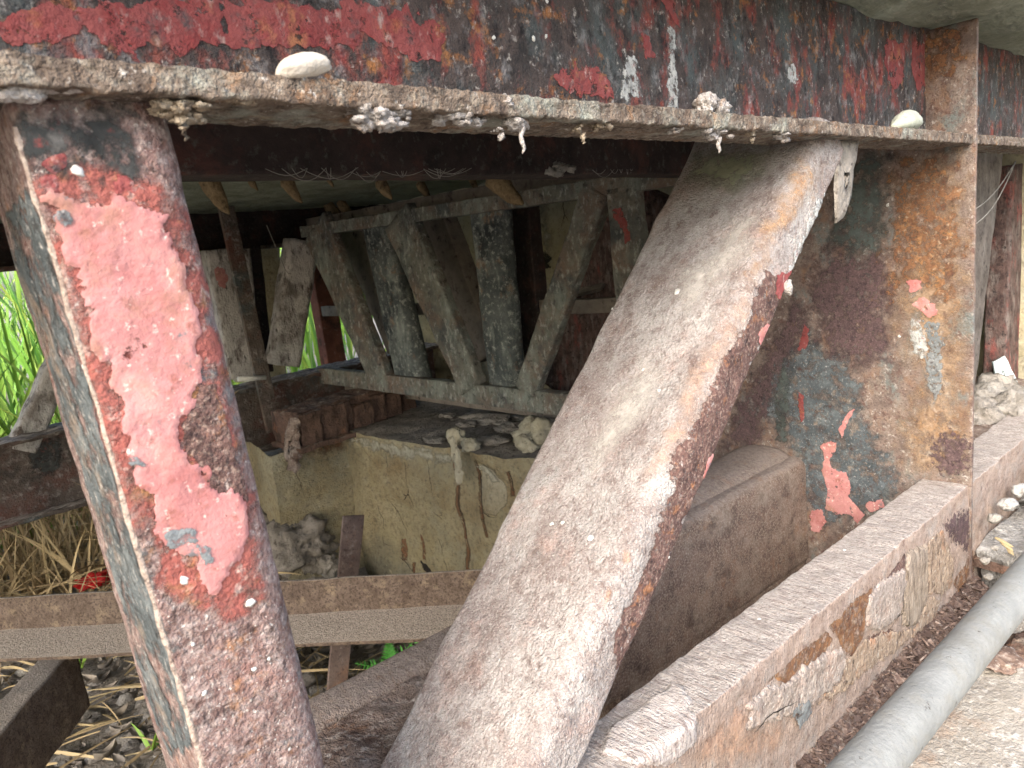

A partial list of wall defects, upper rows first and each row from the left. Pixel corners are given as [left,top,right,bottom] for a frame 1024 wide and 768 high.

peeling [0,0,446,62]
efflorescence [343,103,412,134]
efflorescence [431,93,530,154]
peeling [554,61,614,100]
peeling [884,38,925,91]
corrosion [834,140,860,223]
corrosion [876,151,970,470]
peeling [39,153,249,596]
corrosion [182,384,249,502]
corrosion [614,269,780,670]
peeling [809,409,884,533]